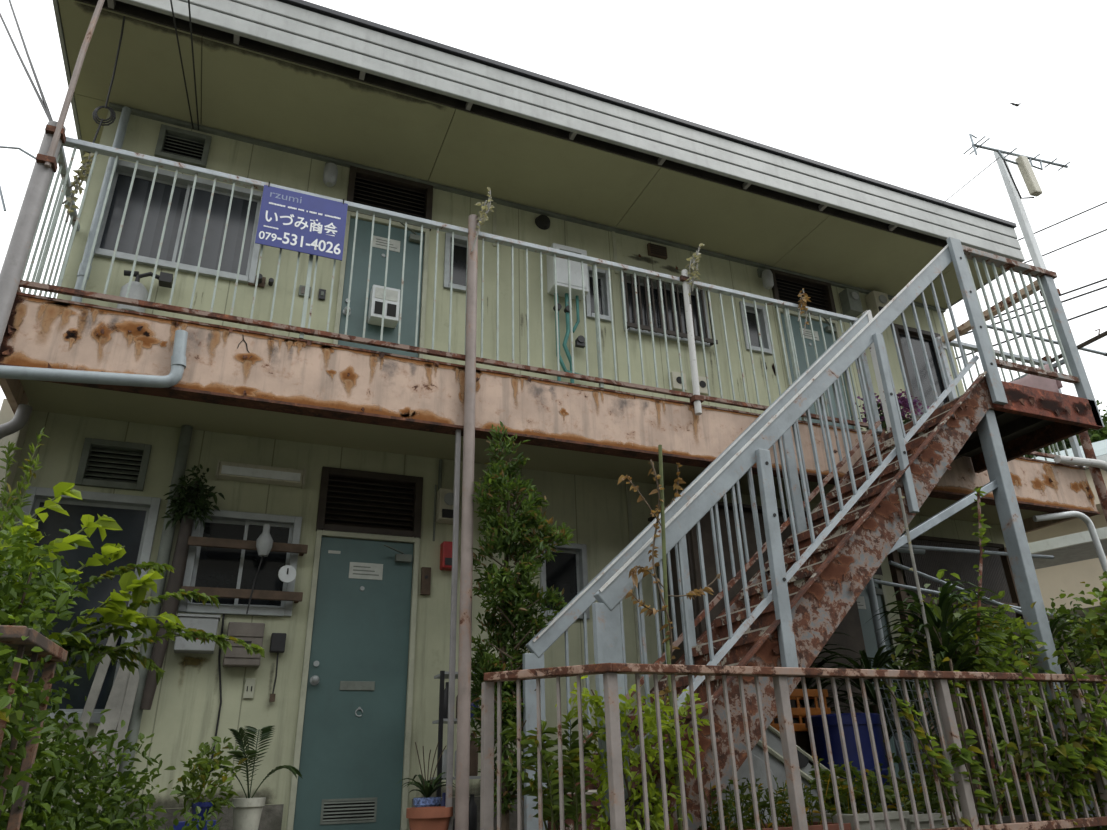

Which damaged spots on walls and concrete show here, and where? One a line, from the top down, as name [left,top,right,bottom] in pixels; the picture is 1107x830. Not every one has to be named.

rust [0,295,759,437]
rust [947,398,979,428]
rust [1004,388,1091,416]
rust [481,422,717,460]
rust [772,464,845,477]
rust [910,441,952,476]
rust [934,485,994,498]
rust [1010,458,1095,511]
rust [861,493,903,531]
rust [807,554,855,600]
rust [742,631,781,682]